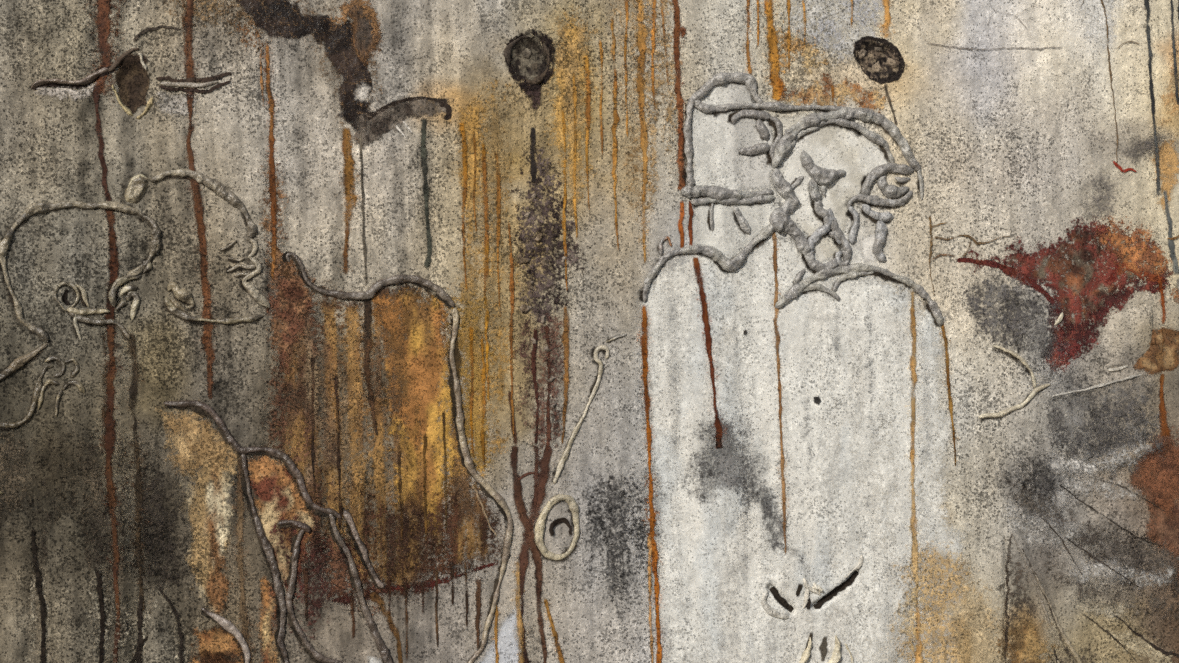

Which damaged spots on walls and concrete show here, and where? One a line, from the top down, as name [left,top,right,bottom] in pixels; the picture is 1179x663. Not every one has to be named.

corrosion [83,0,145,663]
water stain [237,0,452,267]
corrosion [161,0,565,663]
spalling [503,29,556,109]
water stain [578,472,661,618]
corrosion [546,0,722,448]
spalling [780,0,907,124]
corrosion [881,292,1058,663]
corrosion [957,216,1179,578]
water stain [1124,0,1179,290]